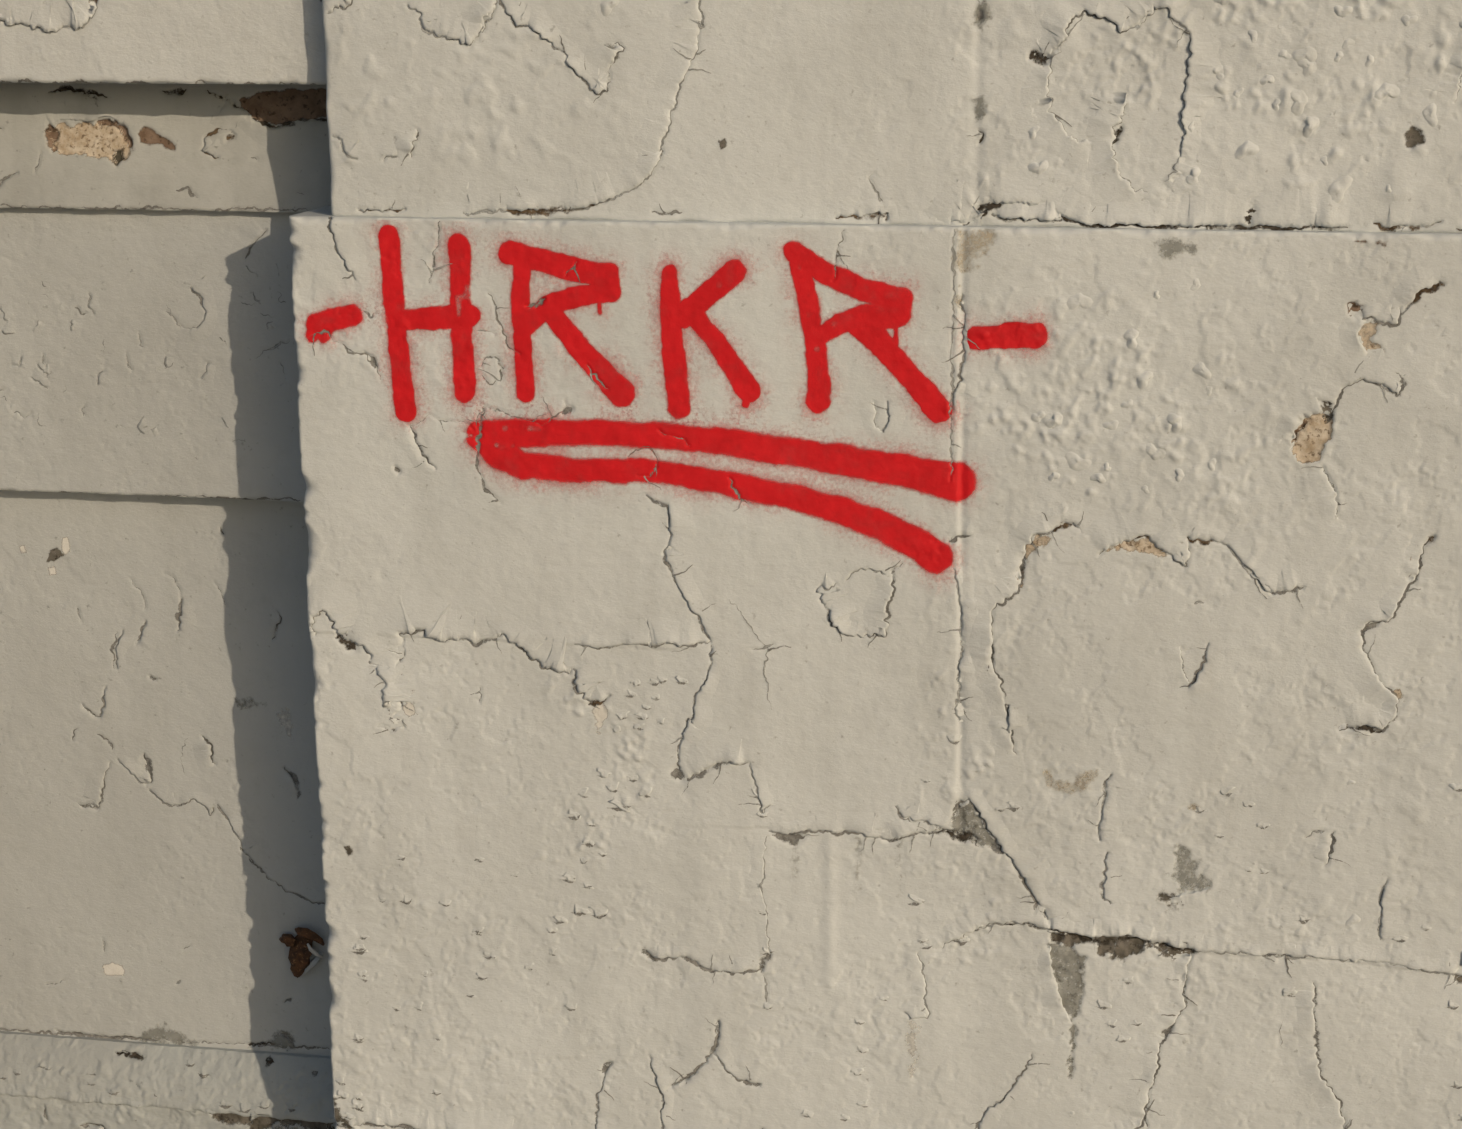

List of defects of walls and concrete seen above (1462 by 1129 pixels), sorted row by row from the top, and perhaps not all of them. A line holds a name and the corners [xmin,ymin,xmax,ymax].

spalling [36,102,175,165]
spalling [195,88,419,161]
crack [423,0,710,276]
crack [943,229,981,473]
spalling [1273,387,1333,463]
crack [1312,266,1448,416]
crack [68,578,325,905]
spalling [952,800,1021,847]
crack [574,430,1462,1129]
peeling [1037,932,1196,1076]